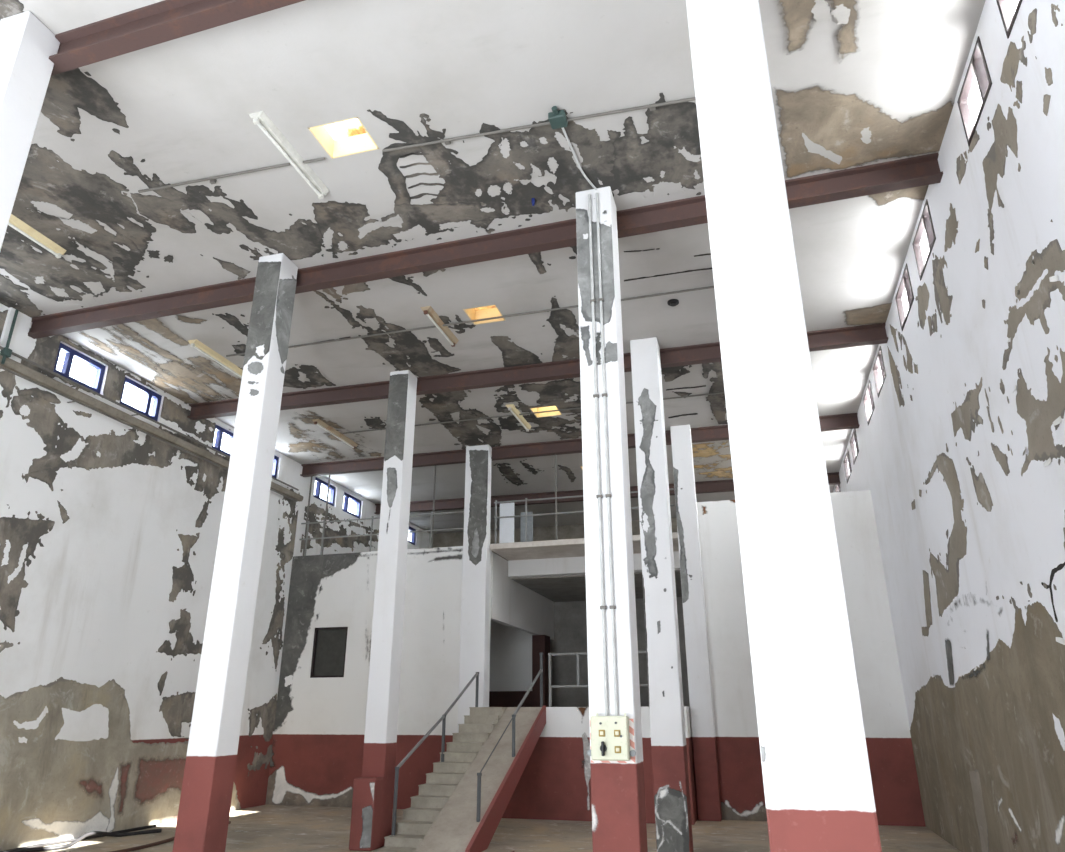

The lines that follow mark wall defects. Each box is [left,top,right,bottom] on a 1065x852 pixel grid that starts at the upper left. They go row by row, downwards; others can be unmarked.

peeling [41,68,129,142]
peeling [0,93,705,396]
peeling [314,282,582,565]
peeling [887,325,918,407]
peeling [915,203,958,337]
peeling [911,239,1065,637]
peeling [956,8,1053,270]
peeling [0,328,230,851]
peeling [260,487,300,669]
peeling [247,693,375,848]
peeling [910,581,1065,852]
crack [1041,562,1065,622]